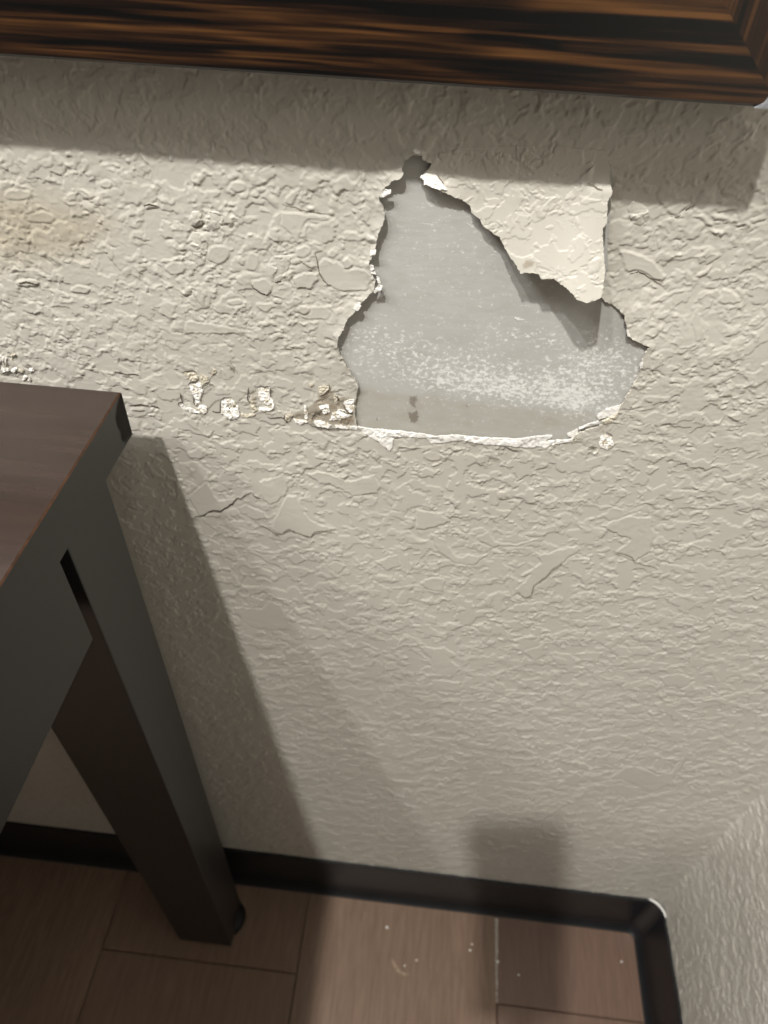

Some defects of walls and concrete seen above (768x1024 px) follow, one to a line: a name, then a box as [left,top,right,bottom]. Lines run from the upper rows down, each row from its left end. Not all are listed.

peeling [178,369,216,414]
peeling [220,146,648,454]